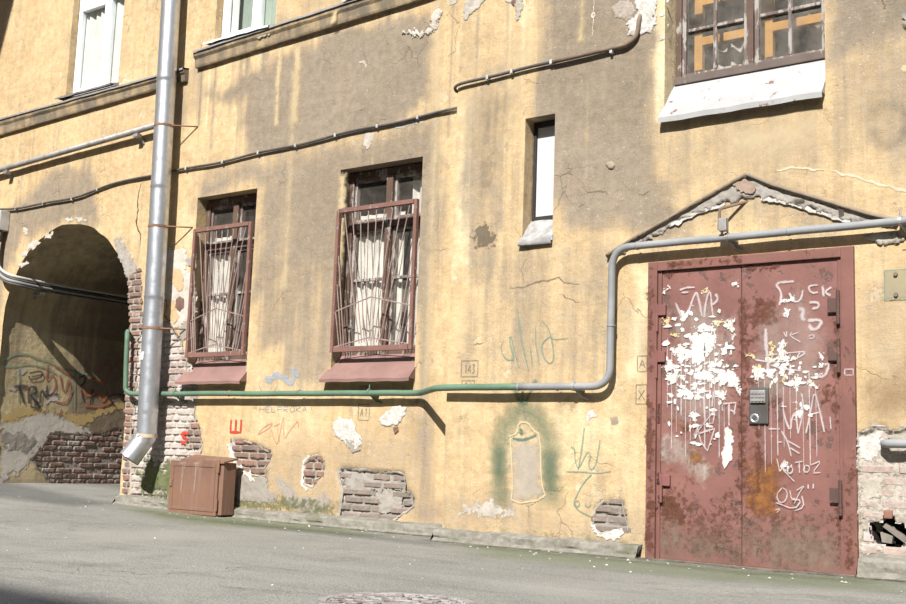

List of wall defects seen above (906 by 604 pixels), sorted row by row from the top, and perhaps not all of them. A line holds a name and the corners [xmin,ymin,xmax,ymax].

peeling [402,0,484,38]
flaking render [505,0,523,21]
flaking render [611,0,669,40]
flaking render [0,236,203,498]
rust [644,298,857,569]
flaking render [226,438,277,504]
flaking render [300,454,325,491]
flaking render [337,467,415,520]
flaking render [591,499,631,541]
flaking render [856,423,906,555]